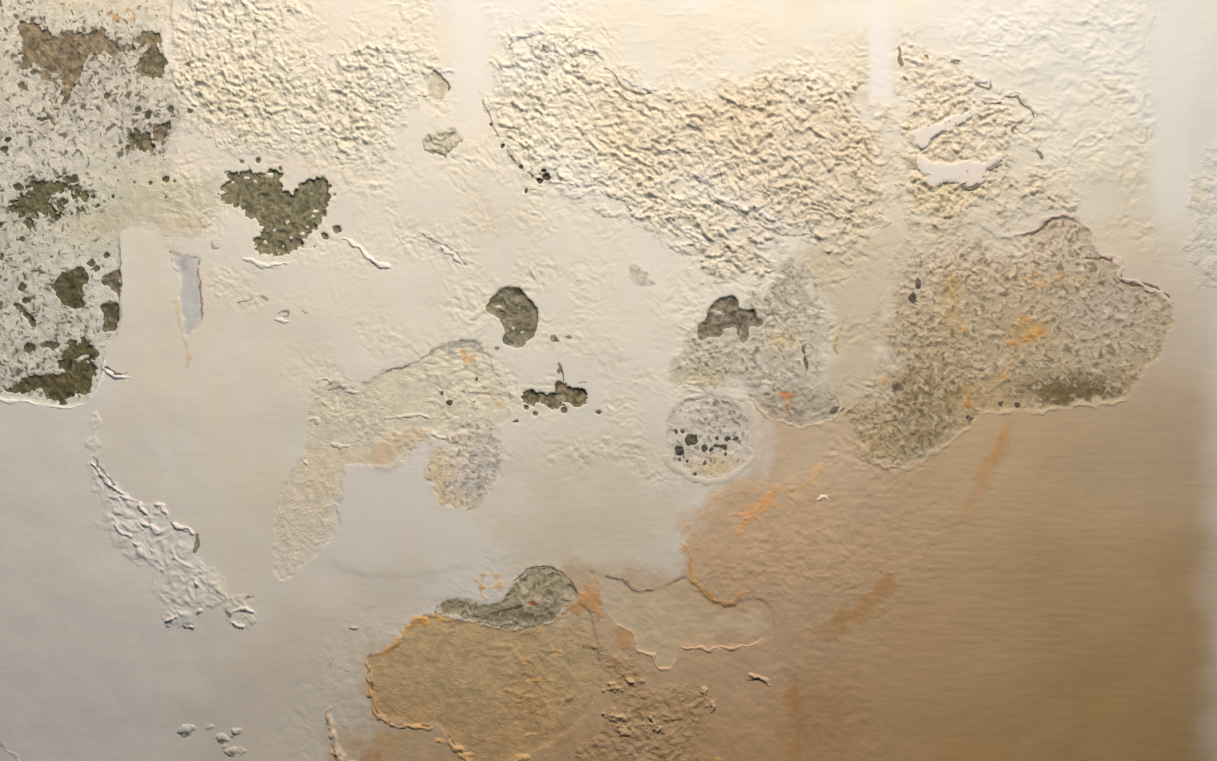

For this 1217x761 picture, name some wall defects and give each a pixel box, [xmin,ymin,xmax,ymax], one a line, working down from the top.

flaking render [0,0,455,631]
damp [345,425,430,471]
peeling [271,286,601,581]
peeling [421,126,463,158]
peeling [478,16,1177,486]
damp [512,194,1217,761]
damp [319,617,471,761]
peeling [364,565,775,761]